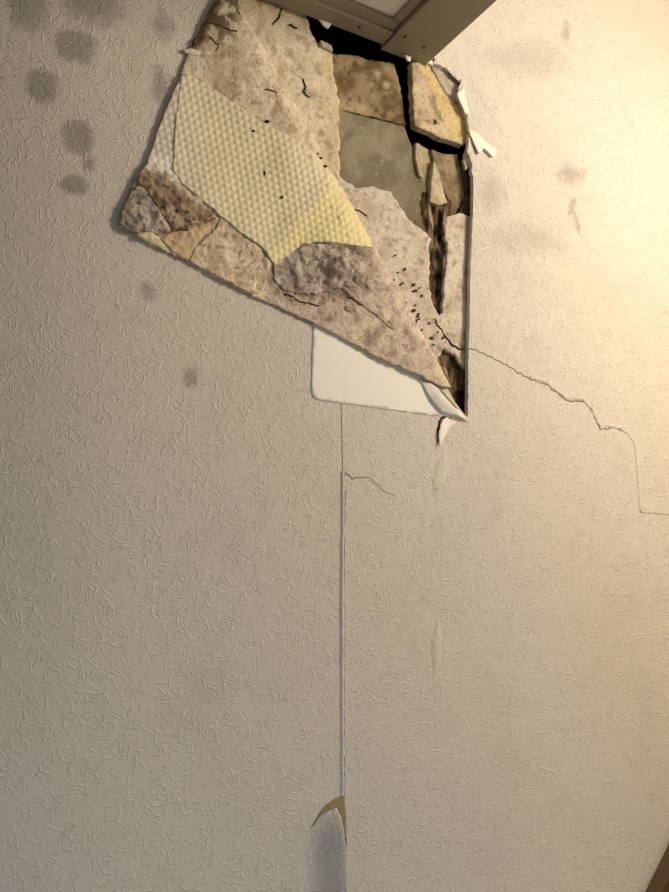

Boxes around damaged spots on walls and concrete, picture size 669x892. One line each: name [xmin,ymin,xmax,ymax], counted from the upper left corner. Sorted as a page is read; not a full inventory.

peeling [117,0,471,414]
crack [344,472,396,496]
crack [469,348,669,515]